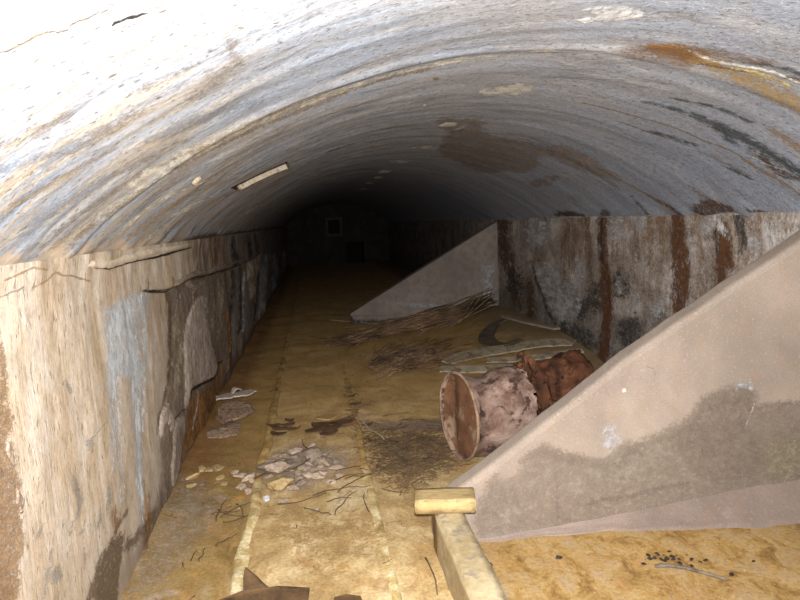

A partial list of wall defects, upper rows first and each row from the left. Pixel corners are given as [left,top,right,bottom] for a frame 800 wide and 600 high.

crack [1,2,179,53]
flaking render [577,6,644,24]
spalling [479,83,534,95]
corrosion [626,43,800,113]
damp [1,54,500,248]
damp [642,98,800,181]
crack [4,244,192,296]
crack [143,252,266,293]
corrosion [631,196,692,313]
corrosion [691,195,765,286]
damp [86,292,156,600]
damp [475,382,800,534]